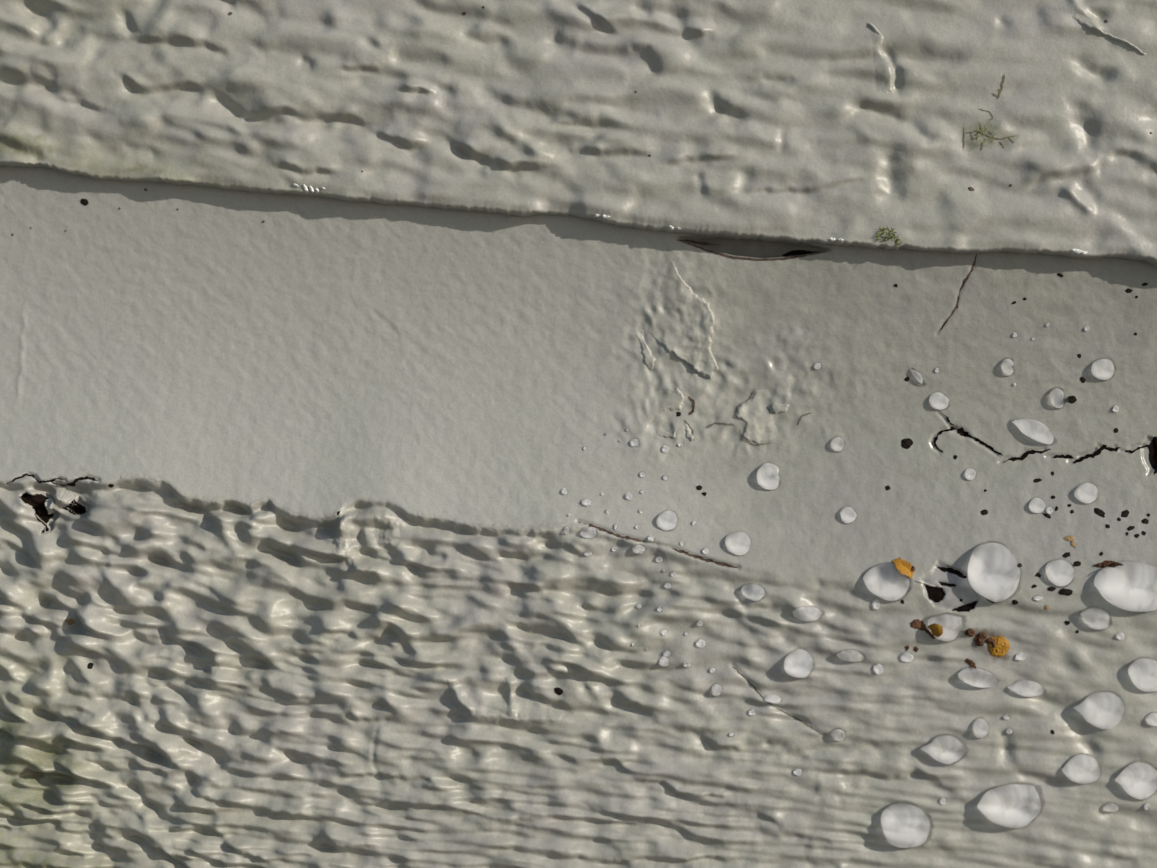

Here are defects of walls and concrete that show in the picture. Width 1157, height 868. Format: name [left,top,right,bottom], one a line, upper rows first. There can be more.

peeling [633,259,719,379]
crack [940,254,977,331]
peeling [645,387,695,442]
crack [933,415,1157,475]
peeling [45,490,74,514]
spalling [914,562,994,612]